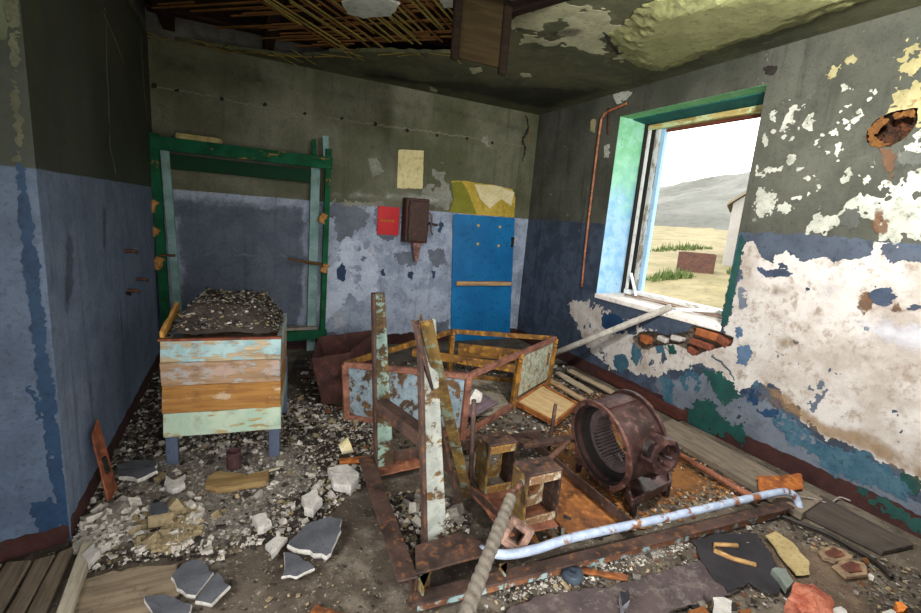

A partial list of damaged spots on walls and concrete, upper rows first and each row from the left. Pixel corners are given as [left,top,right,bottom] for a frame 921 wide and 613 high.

crack [150,83,530,162]
peeling [367,158,384,177]
peeling [421,169,453,210]
peeling [317,198,402,336]
peeling [394,251,417,279]
peeling [427,248,447,279]
peeling [569,38,921,534]